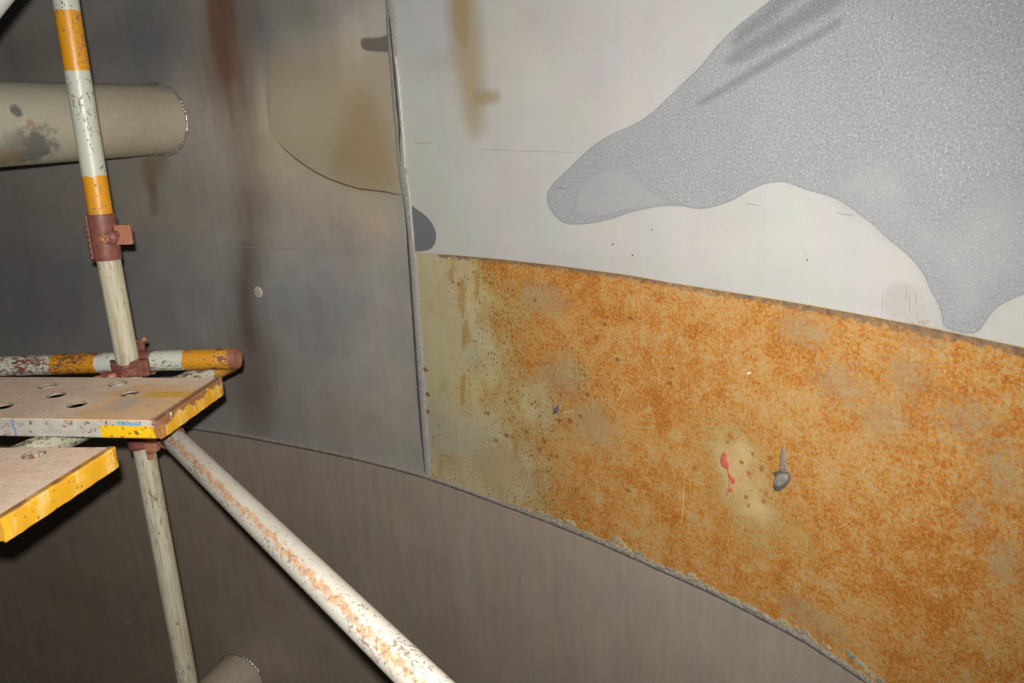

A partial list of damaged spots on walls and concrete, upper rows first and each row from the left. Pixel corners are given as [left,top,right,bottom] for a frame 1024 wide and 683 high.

corrosion [439,254,1024,683]